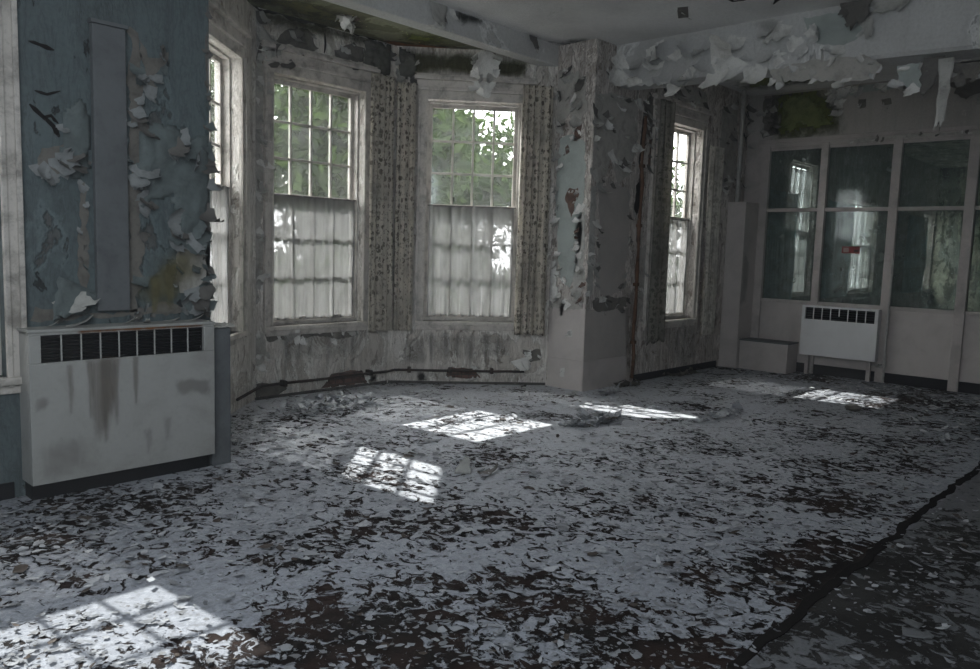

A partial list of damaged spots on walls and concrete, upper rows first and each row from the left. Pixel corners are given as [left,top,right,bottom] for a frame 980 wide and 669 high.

peeling [276,28,319,57]
water stain [260,0,369,43]
peeling [334,14,365,70]
peeling [201,31,218,161]
peeling [881,61,923,109]
peeling [950,60,980,88]
peeling [549,6,882,315]
peeling [169,221,235,328]